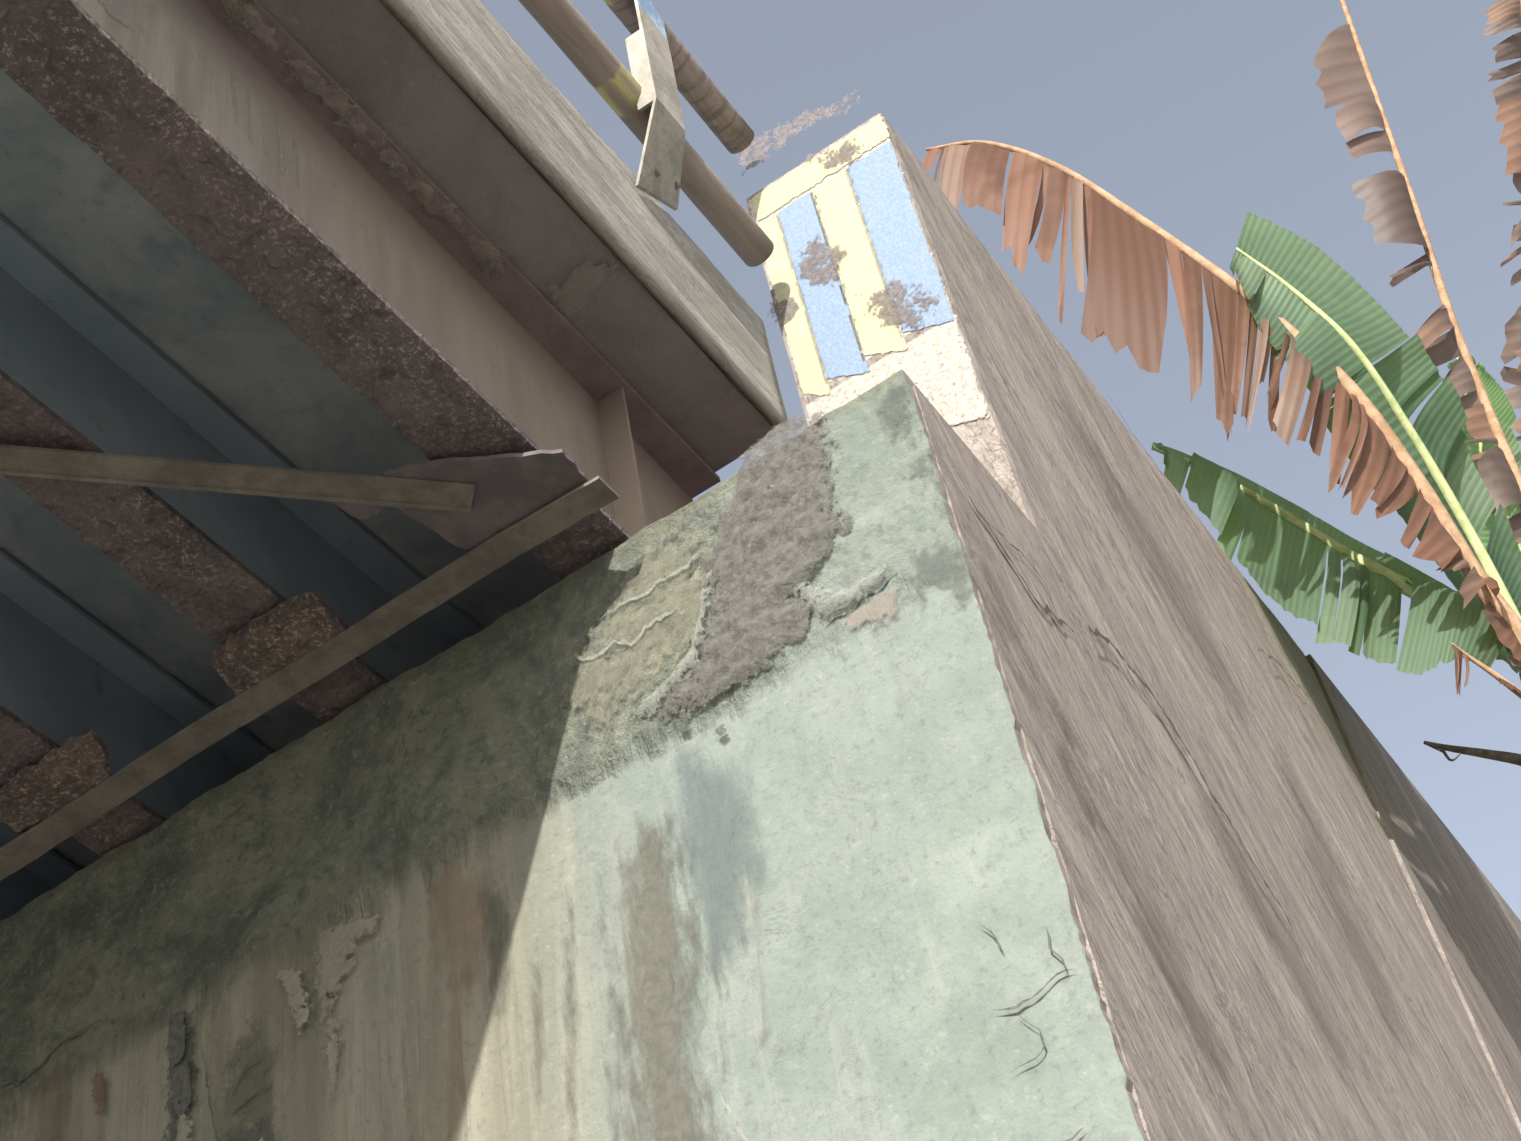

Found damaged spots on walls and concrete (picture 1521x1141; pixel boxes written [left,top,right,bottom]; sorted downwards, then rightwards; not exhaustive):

spalling [623,412,899,731]
crack [963,488,1308,961]
peeling [161,1009,204,1141]
damp [273,912,380,1097]
damp [609,820,714,1141]
crack [998,926,1072,1072]